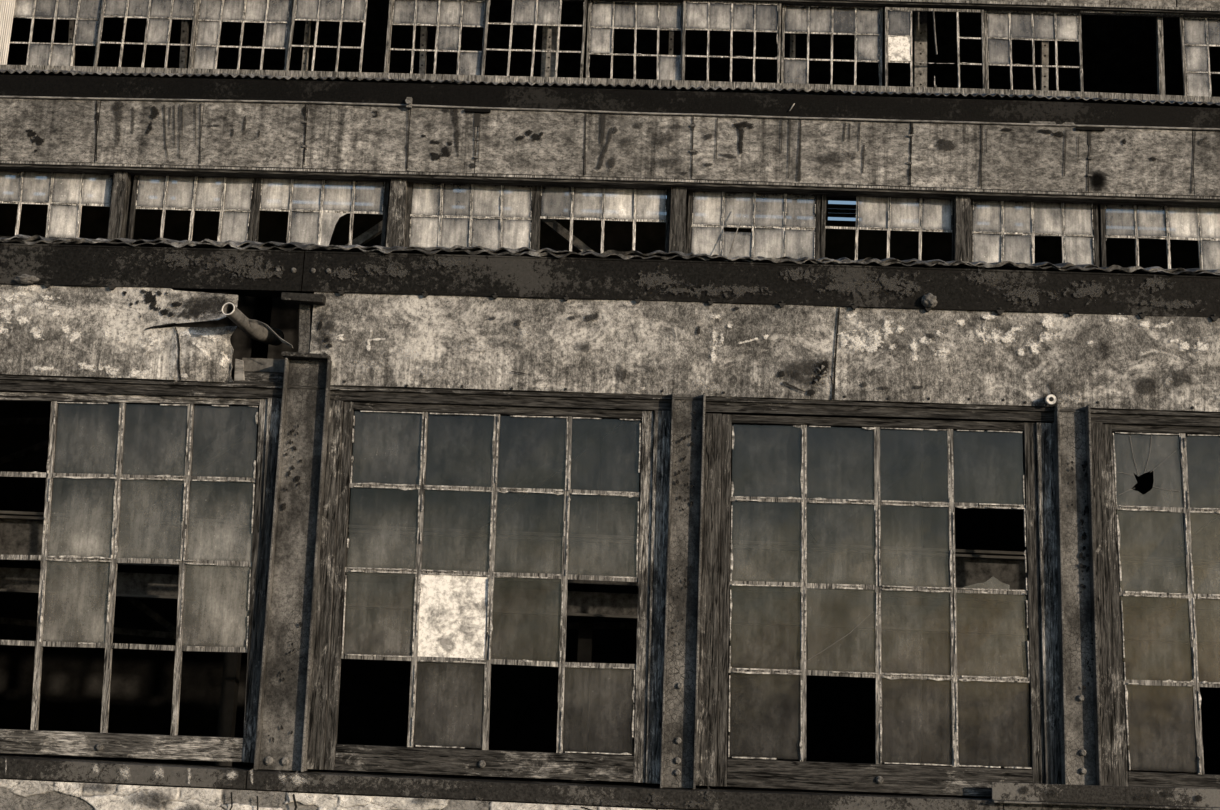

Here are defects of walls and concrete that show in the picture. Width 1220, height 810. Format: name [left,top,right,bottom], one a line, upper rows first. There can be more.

leakage [112,101,134,144]
leakage [163,104,196,159]
leakage [442,108,460,157]
leakage [597,114,642,171]
leakage [654,124,680,167]
leakage [816,123,865,173]
peeling [0,285,81,341]
peeling [957,268,1118,356]
peeling [1109,275,1219,328]
peeling [78,362,145,377]
peeling [105,331,164,352]
peeling [1170,339,1208,358]